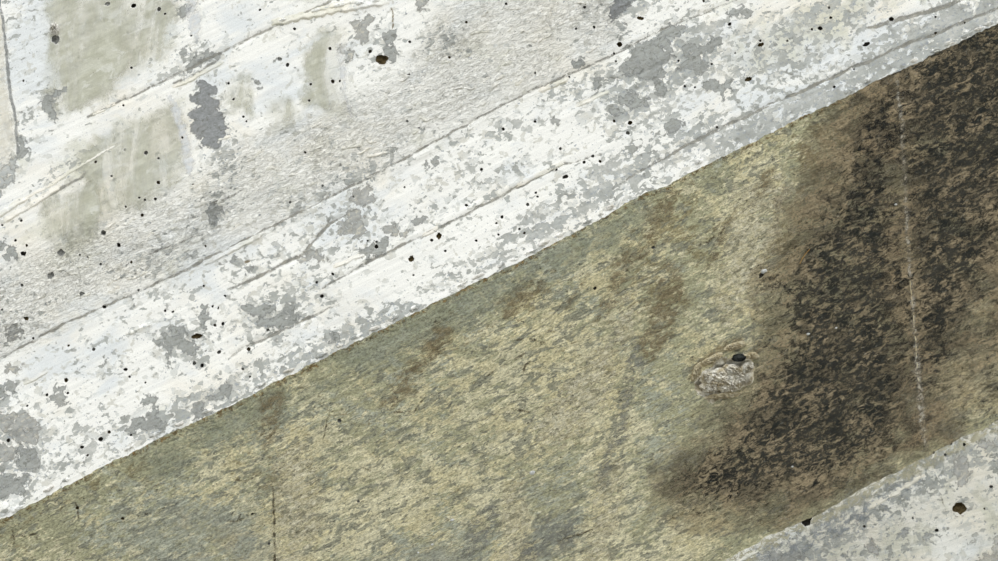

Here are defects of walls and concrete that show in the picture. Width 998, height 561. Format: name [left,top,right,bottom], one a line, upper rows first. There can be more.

peeling [608,0,636,23]
peeling [179,48,231,149]
peeling [609,22,734,117]
peeling [664,118,686,135]
crack [4,11,710,358]
damp [707,169,791,328]
spalling [689,338,760,405]
damp [908,258,926,443]
peeling [0,362,42,499]
crack [236,476,276,561]